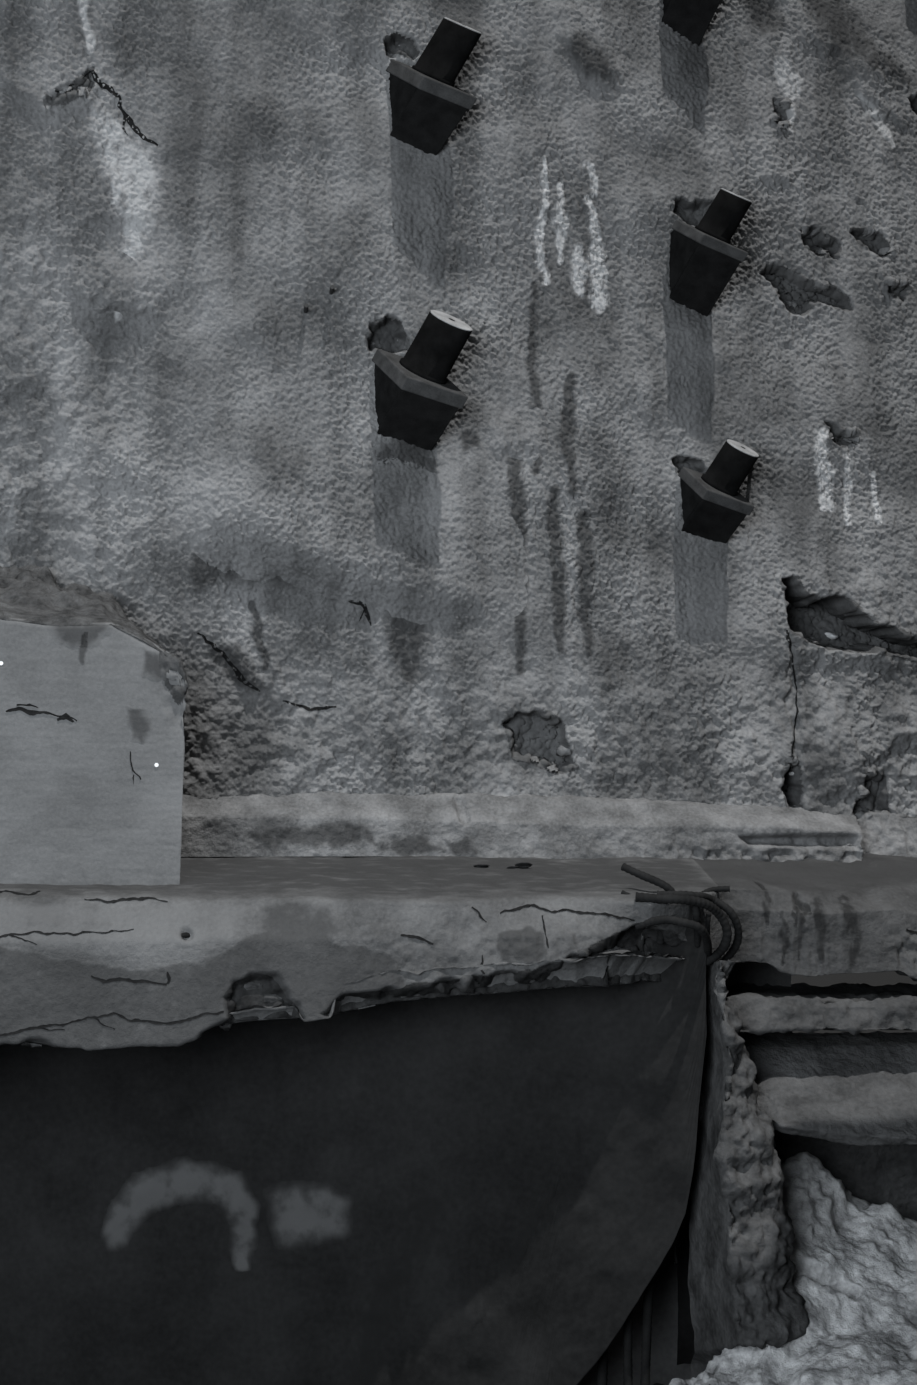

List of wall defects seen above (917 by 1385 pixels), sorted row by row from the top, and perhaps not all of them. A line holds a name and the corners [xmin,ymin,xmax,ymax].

spalling [801,225,900,259]
spalling [758,265,853,315]
leakage [503,153,612,678]
leakage [811,422,883,529]
spalling [782,577,917,662]
crack [786,630,799,757]
crack [0,888,40,896]
crack [0,897,168,945]
crack [401,934,433,945]
crack [472,904,635,948]
spalling [0,921,707,1385]